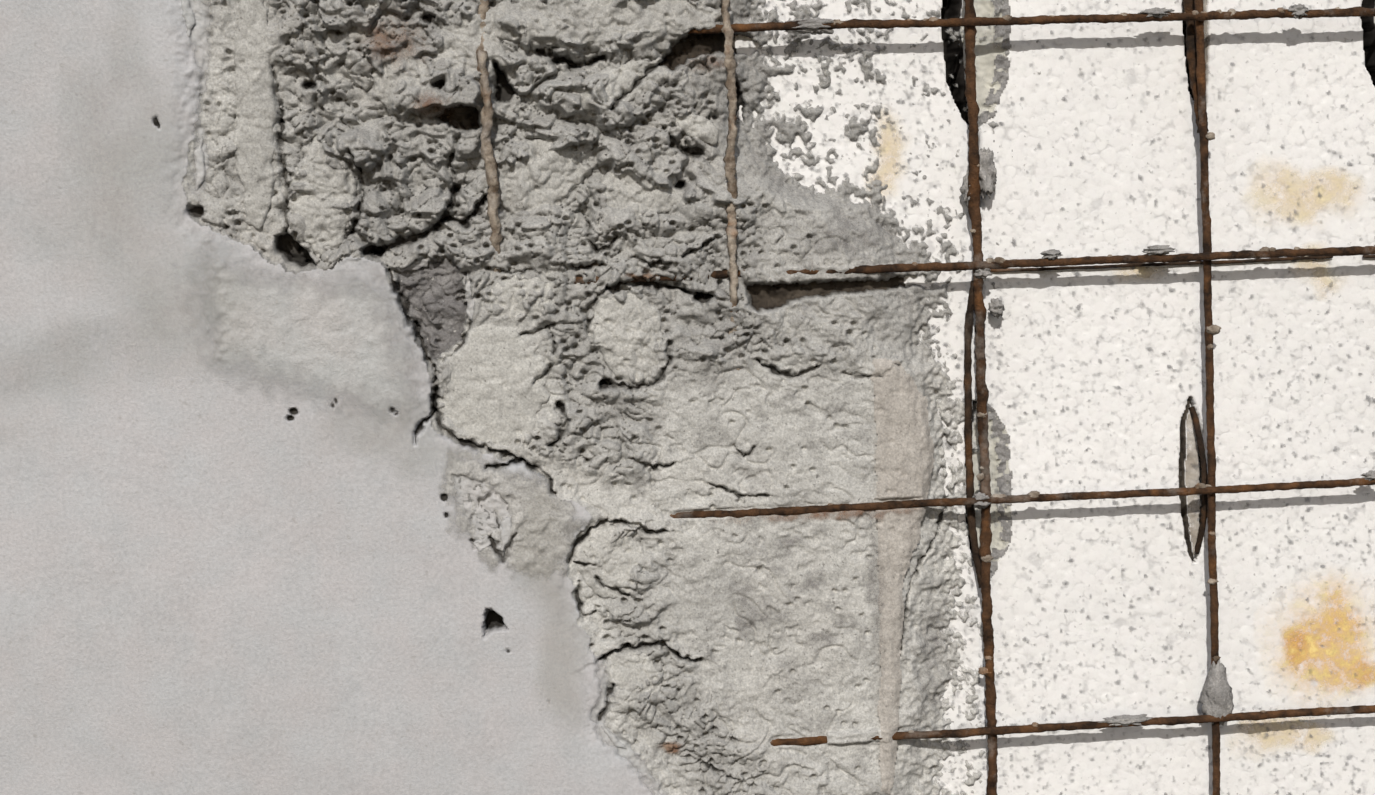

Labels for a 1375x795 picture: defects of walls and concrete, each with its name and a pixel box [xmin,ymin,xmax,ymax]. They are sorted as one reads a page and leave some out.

hole [658,32,737,70]
hole [438,105,480,130]
rust [1272,172,1348,220]
peeling [203,234,474,418]
crack [346,153,715,562]
hole [747,277,910,311]
peeling [441,450,588,578]
rust [813,510,884,519]
crack [568,519,668,612]
rust [1284,591,1375,688]
crack [598,640,701,721]
rust [1243,719,1327,746]